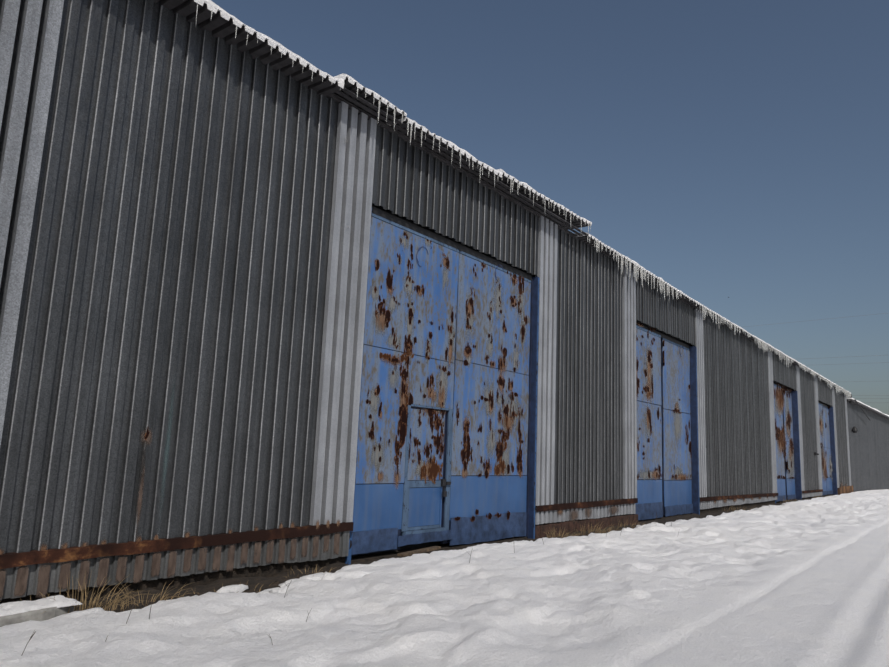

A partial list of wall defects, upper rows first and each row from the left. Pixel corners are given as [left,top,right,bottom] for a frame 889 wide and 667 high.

rust [116,520,340,583]